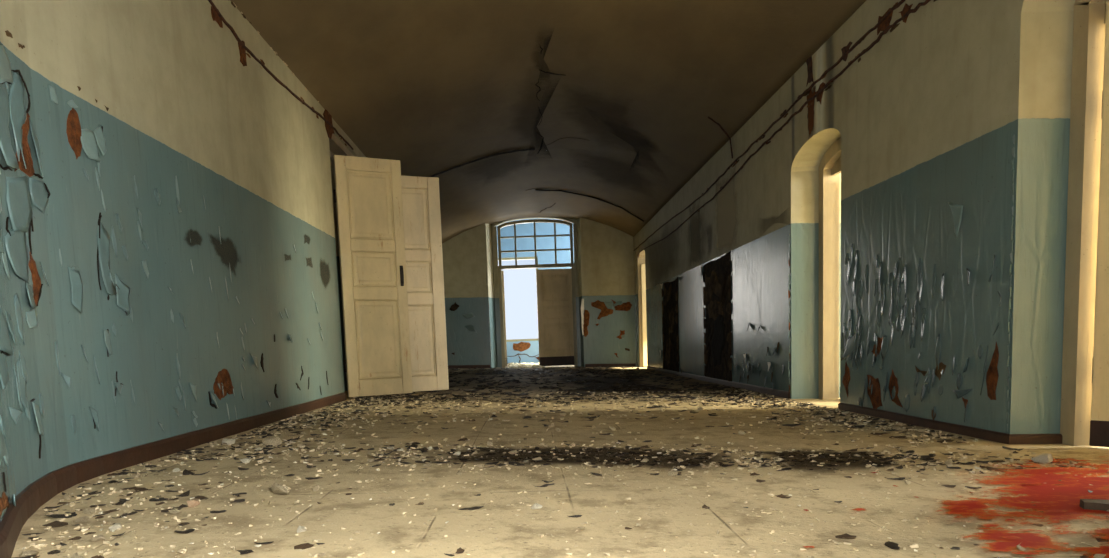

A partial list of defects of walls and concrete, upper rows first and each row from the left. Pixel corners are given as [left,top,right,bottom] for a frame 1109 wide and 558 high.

rust [807,86,816,136]
peeling [0,30,49,466]
peeling [48,85,133,323]
water stain [186,230,238,274]
spalling [210,369,244,420]
spalling [513,342,539,360]
spalling [580,299,632,337]
spalling [660,277,682,374]
spalling [700,234,790,393]
peeling [840,244,999,422]